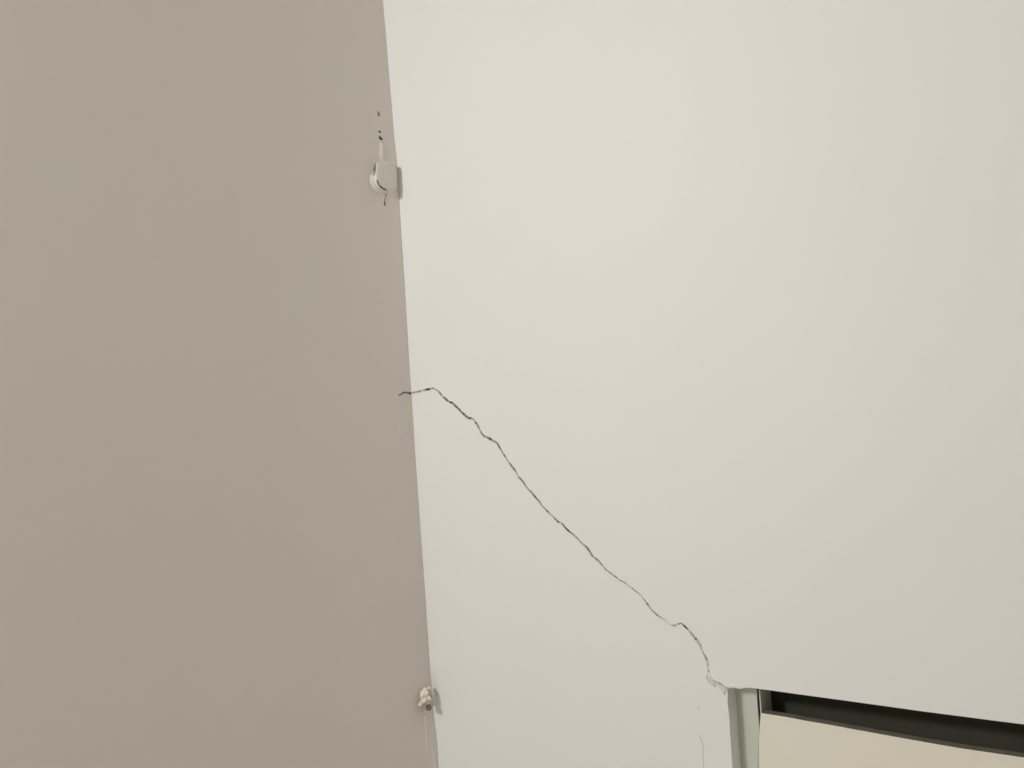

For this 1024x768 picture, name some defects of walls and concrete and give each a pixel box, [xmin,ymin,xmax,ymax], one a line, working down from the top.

crack [397,386,727,768]